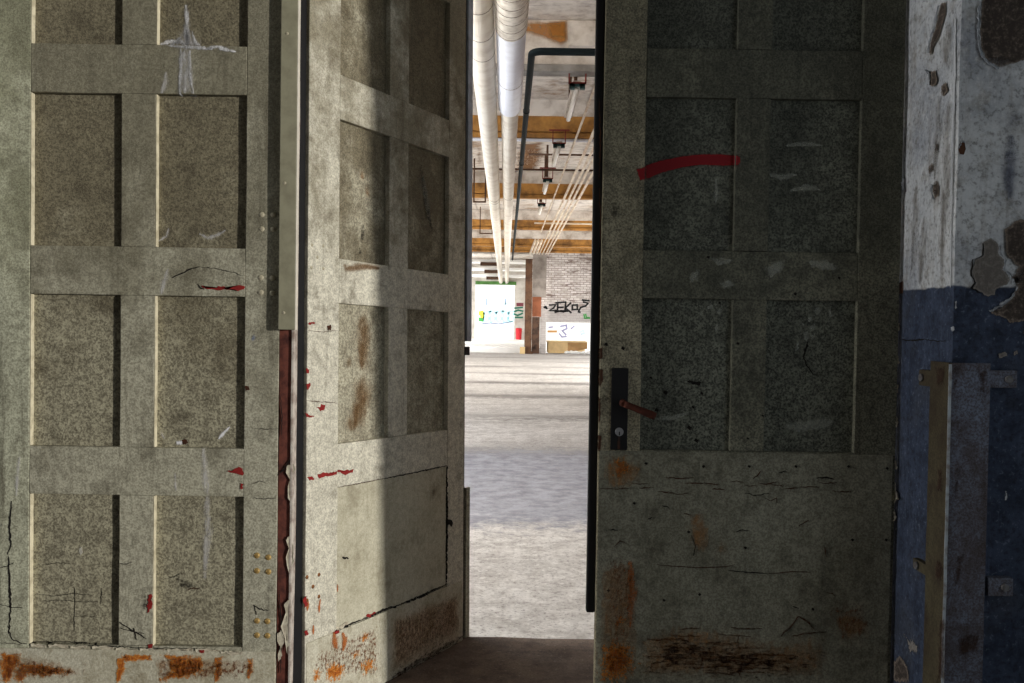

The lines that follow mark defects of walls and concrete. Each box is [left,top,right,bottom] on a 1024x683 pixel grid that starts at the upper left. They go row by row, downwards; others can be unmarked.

peeling [927,2,946,55]
flaking render [977,0,1024,69]
peeling [924,69,948,96]
peeling [929,163,939,200]
flaking render [970,219,1024,323]
peeling [278,460,295,500]
crack [0,501,147,644]
rust [0,652,75,683]
rust [116,654,253,682]
peeling [277,594,291,673]
rust [314,630,379,682]
rust [599,554,824,683]